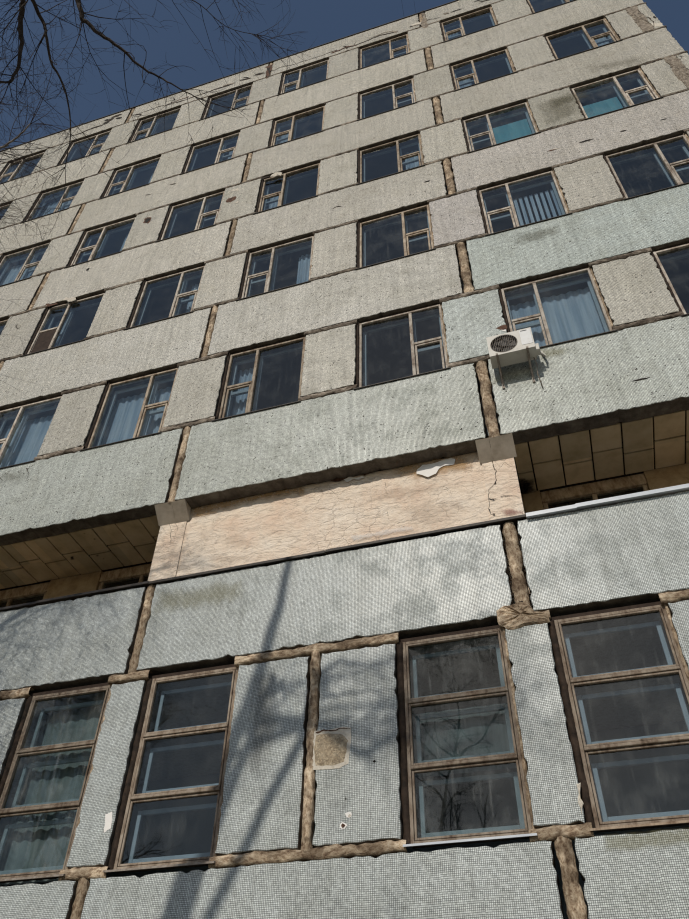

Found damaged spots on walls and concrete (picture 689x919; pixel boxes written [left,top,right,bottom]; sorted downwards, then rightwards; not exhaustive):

spalling [625,6,663,32]
spalling [664,55,689,89]
peeling [416,458,455,477]
crack [364,461,515,523]
spalling [312,727,351,770]